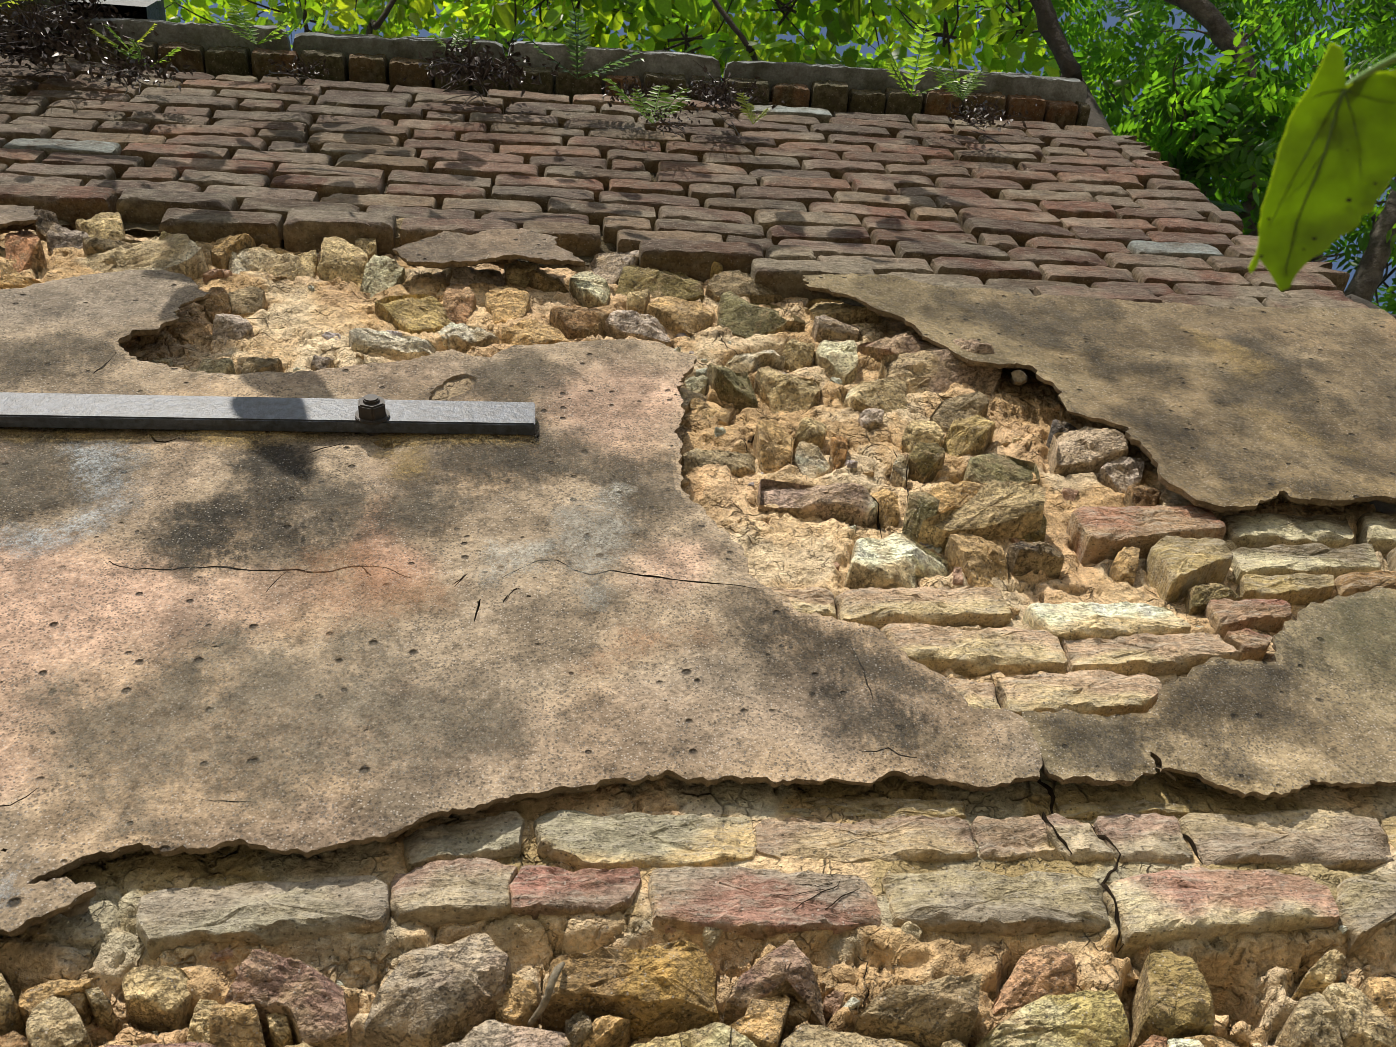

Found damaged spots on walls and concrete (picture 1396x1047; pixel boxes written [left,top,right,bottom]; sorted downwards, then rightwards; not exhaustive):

water stain [142,348,696,610]
flaking render [0,206,1396,717]
flaking render [0,747,1396,1047]
crack [1037,779,1124,954]